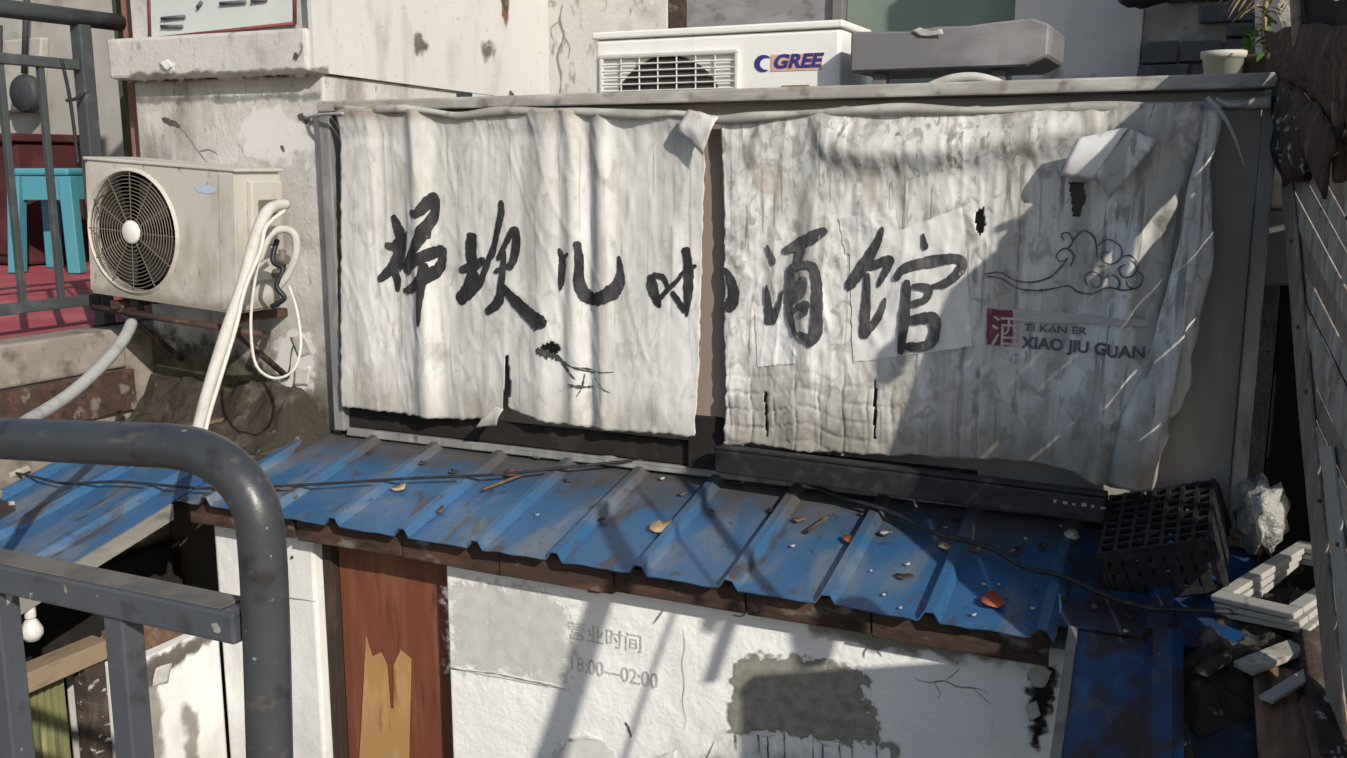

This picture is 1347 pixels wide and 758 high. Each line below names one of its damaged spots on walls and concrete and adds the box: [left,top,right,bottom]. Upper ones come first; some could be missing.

crack [917,669,991,704]
water stain [149,684,163,758]
water stain [182,706,199,758]
water stain [880,743,900,758]